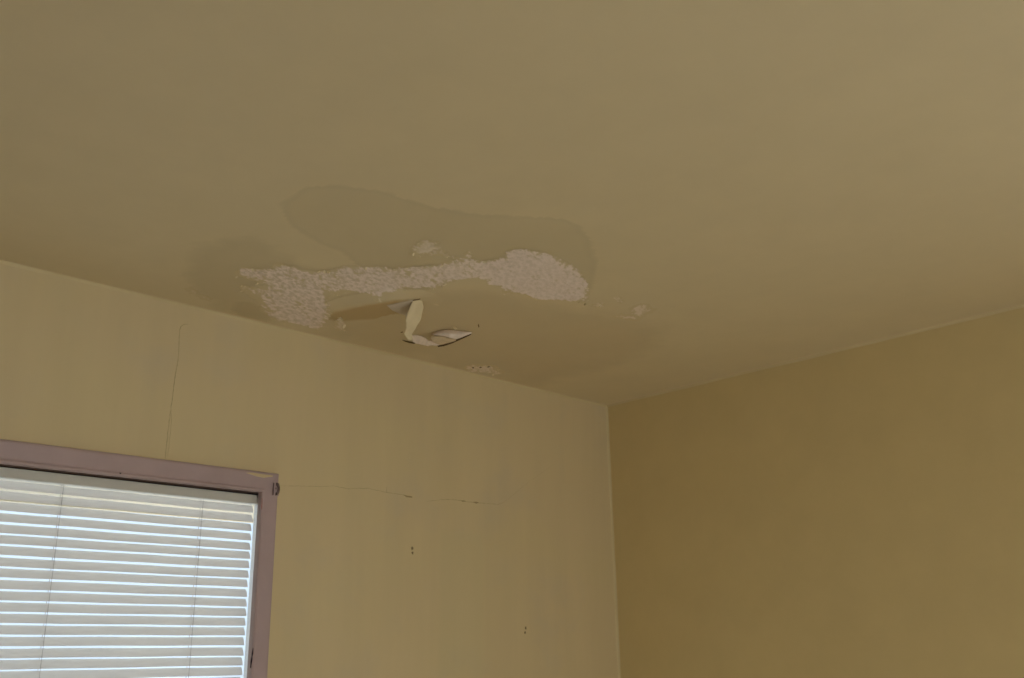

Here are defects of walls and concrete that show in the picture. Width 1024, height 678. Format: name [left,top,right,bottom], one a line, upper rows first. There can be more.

peeling [233,248,591,333]